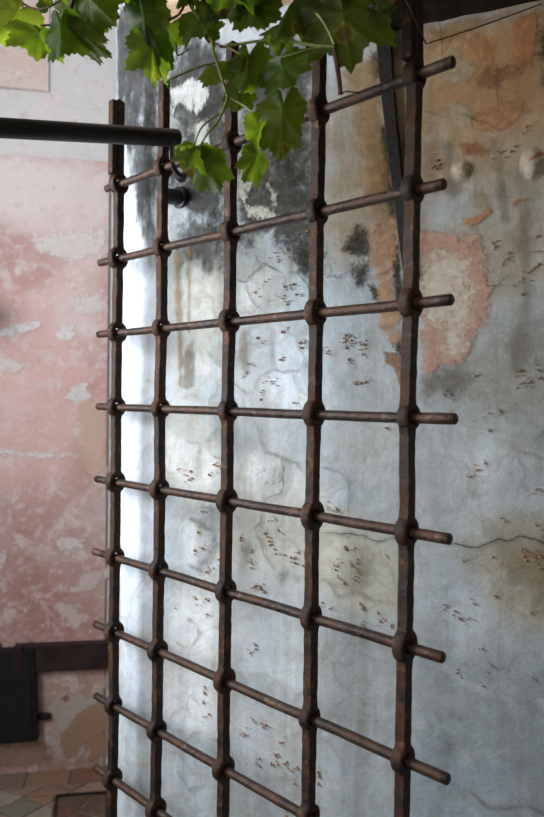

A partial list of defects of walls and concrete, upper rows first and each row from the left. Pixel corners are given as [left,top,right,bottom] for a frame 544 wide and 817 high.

water stain [117,8,159,127]
water stain [169,37,225,146]
flaking render [434,48,475,85]
water stain [127,145,157,244]
water stain [237,123,311,275]
water stain [342,226,378,300]
flaking render [369,216,399,302]
flaking render [418,209,498,374]
flaking render [65,382,107,473]
crack [321,532,395,542]
crack [450,535,544,548]
flaking render [0,691,109,768]